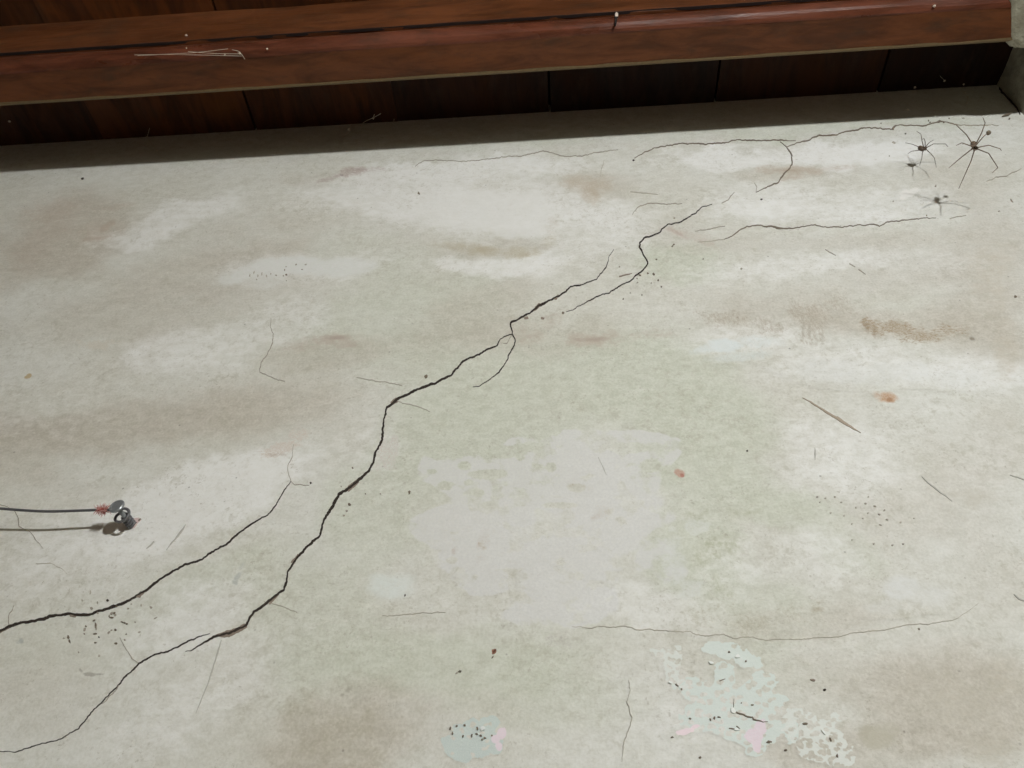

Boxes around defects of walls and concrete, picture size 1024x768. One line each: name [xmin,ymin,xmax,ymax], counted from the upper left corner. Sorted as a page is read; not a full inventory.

crack [415,120,999,193]
crack [0,191,977,756]
peeling [440,715,507,764]
peeling [647,640,857,768]